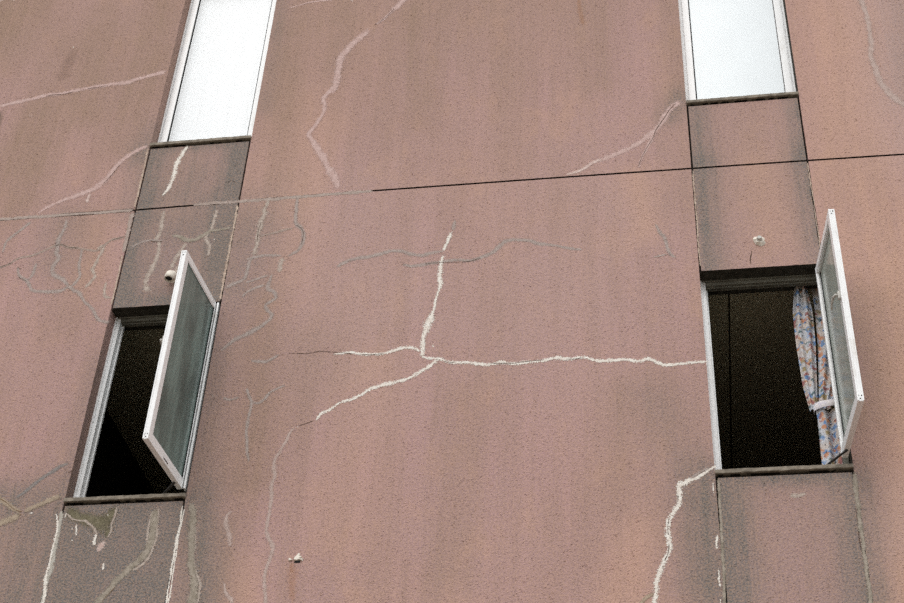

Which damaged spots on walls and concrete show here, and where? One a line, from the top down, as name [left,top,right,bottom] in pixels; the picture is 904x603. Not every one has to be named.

crack [0,71,166,107]
crack [306,0,406,188]
crack [567,101,680,175]
crack [859,0,904,107]
crack [0,145,230,324]
crack [224,386,283,461]
crack [251,221,716,603]
crack [93,508,160,603]
crack [187,503,234,603]